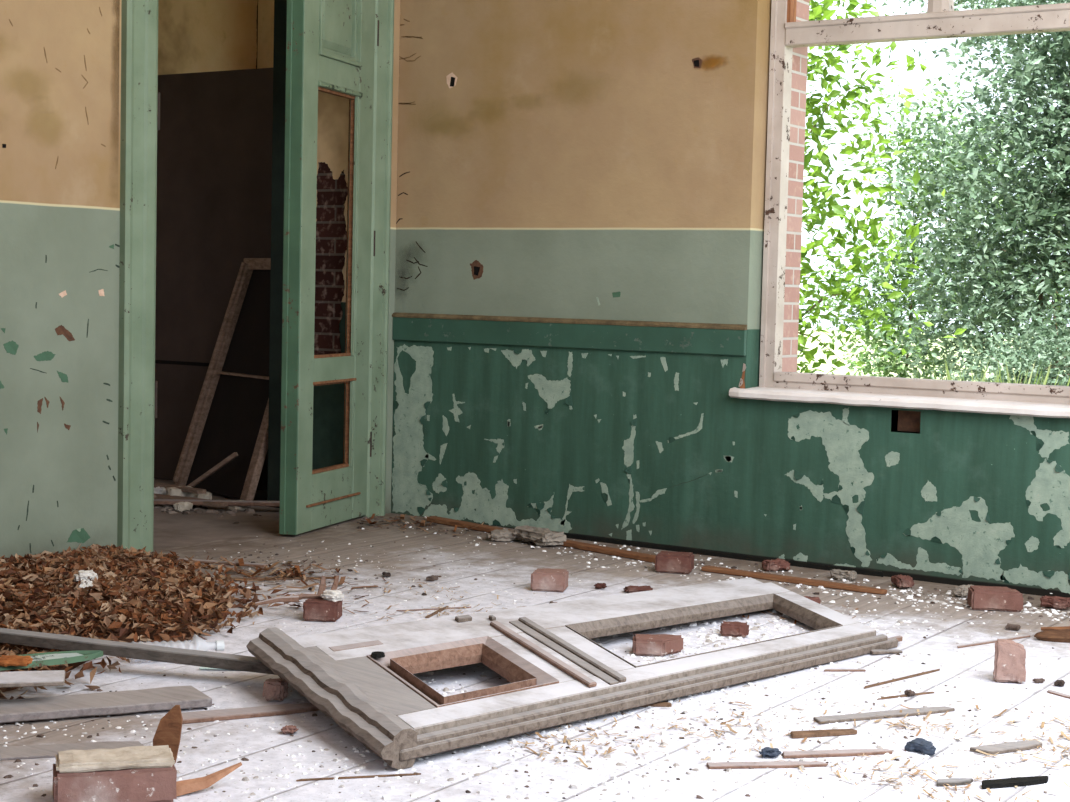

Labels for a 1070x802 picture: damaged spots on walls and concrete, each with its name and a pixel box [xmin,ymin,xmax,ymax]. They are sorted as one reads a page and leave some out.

peeling [392,344,612,533]
peeling [609,413,667,540]
peeling [660,357,679,391]
peeling [656,402,704,453]
peeling [779,553,808,562]
peeling [785,408,1070,594]